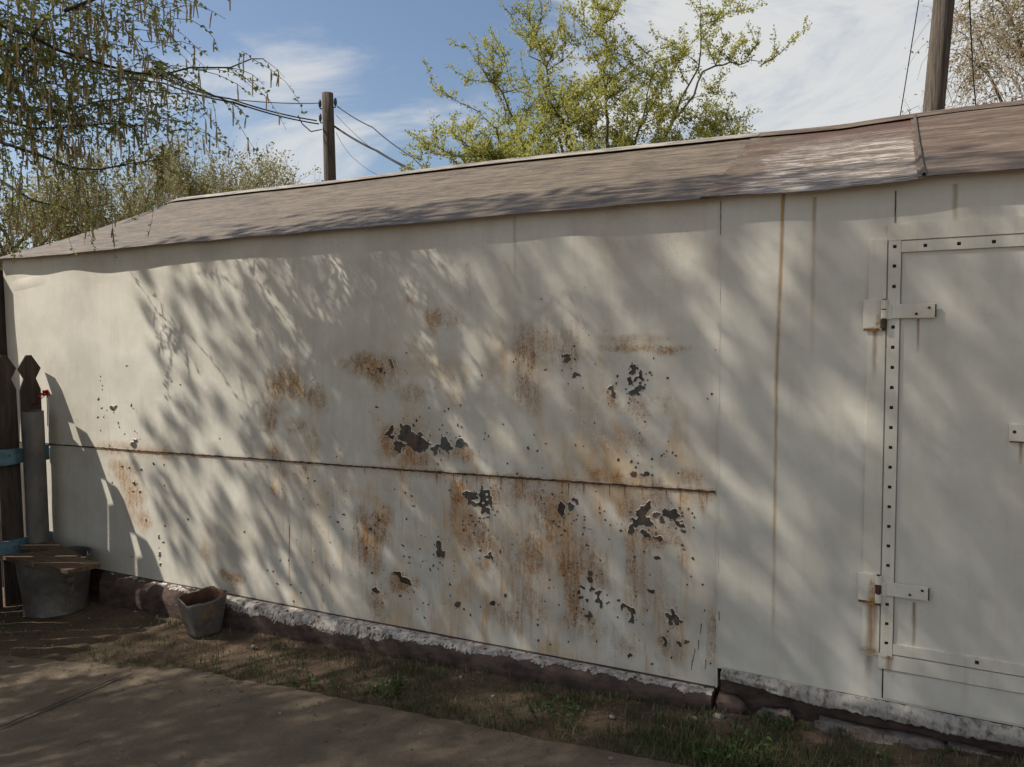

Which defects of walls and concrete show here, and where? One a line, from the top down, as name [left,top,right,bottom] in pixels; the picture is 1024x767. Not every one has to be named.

peeling [607,363,653,404]
peeling [384,404,490,466]
peeling [448,483,501,562]
peeling [540,489,589,547]
peeling [599,498,695,560]
peeling [110,572,199,593]
peeling [371,536,447,619]
peeling [226,559,714,696]